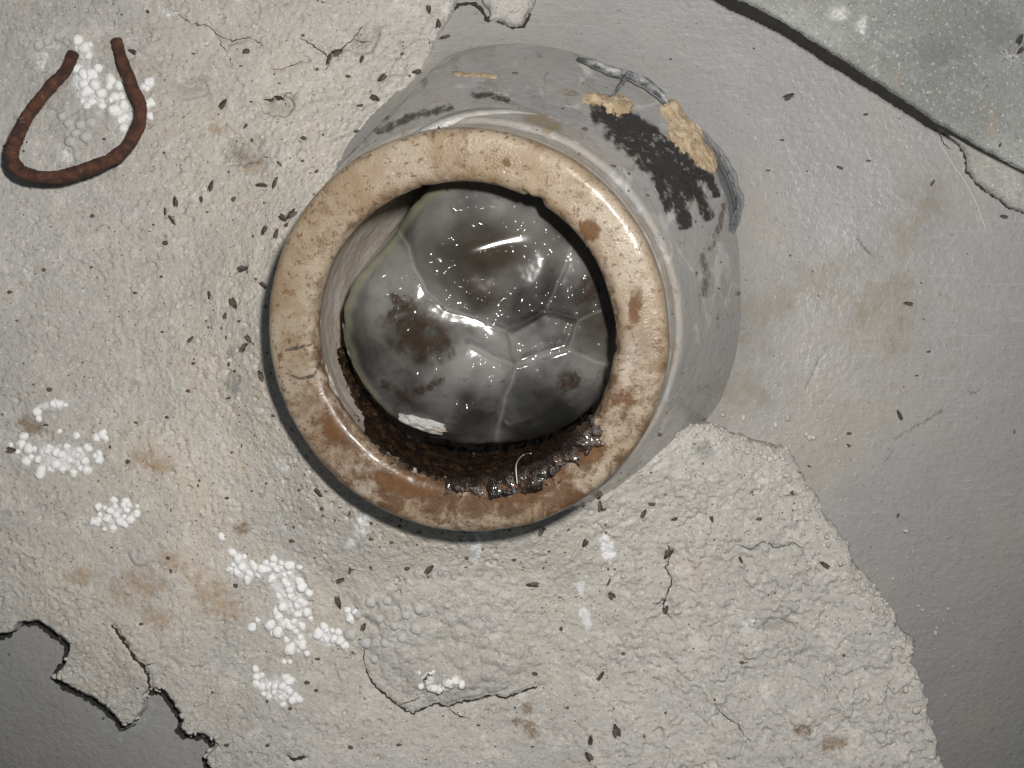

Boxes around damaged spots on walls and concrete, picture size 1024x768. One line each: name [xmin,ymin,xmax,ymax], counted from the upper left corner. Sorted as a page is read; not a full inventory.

efflorescence [111,99,135,124]
damp [653,171,673,213]
damp [681,167,721,221]
crack [936,127,1024,214]
rust [321,404,348,444]
rust [357,468,457,502]
efflorescence [229,551,307,626]
crack [363,648,538,718]